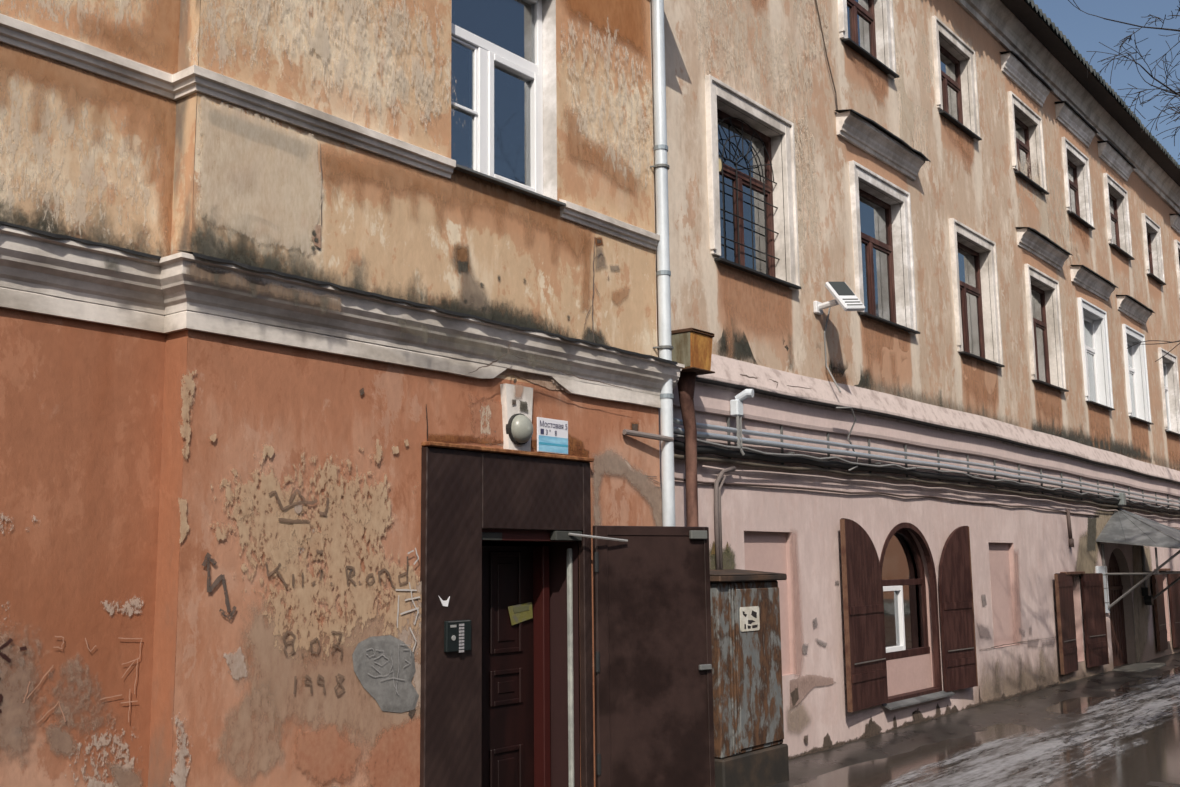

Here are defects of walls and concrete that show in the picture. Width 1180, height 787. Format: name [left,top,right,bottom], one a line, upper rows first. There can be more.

peeling [190,0,450,129]
damp [0,44,176,258]
damp [0,204,135,269]
damp [187,227,568,337]
damp [582,327,608,346]
flaking render [180,370,196,459]
flaking render [178,497,189,543]
peeling [102,597,143,617]
peeling [210,439,422,787]
peeling [0,607,142,787]
flaking render [169,716,191,787]